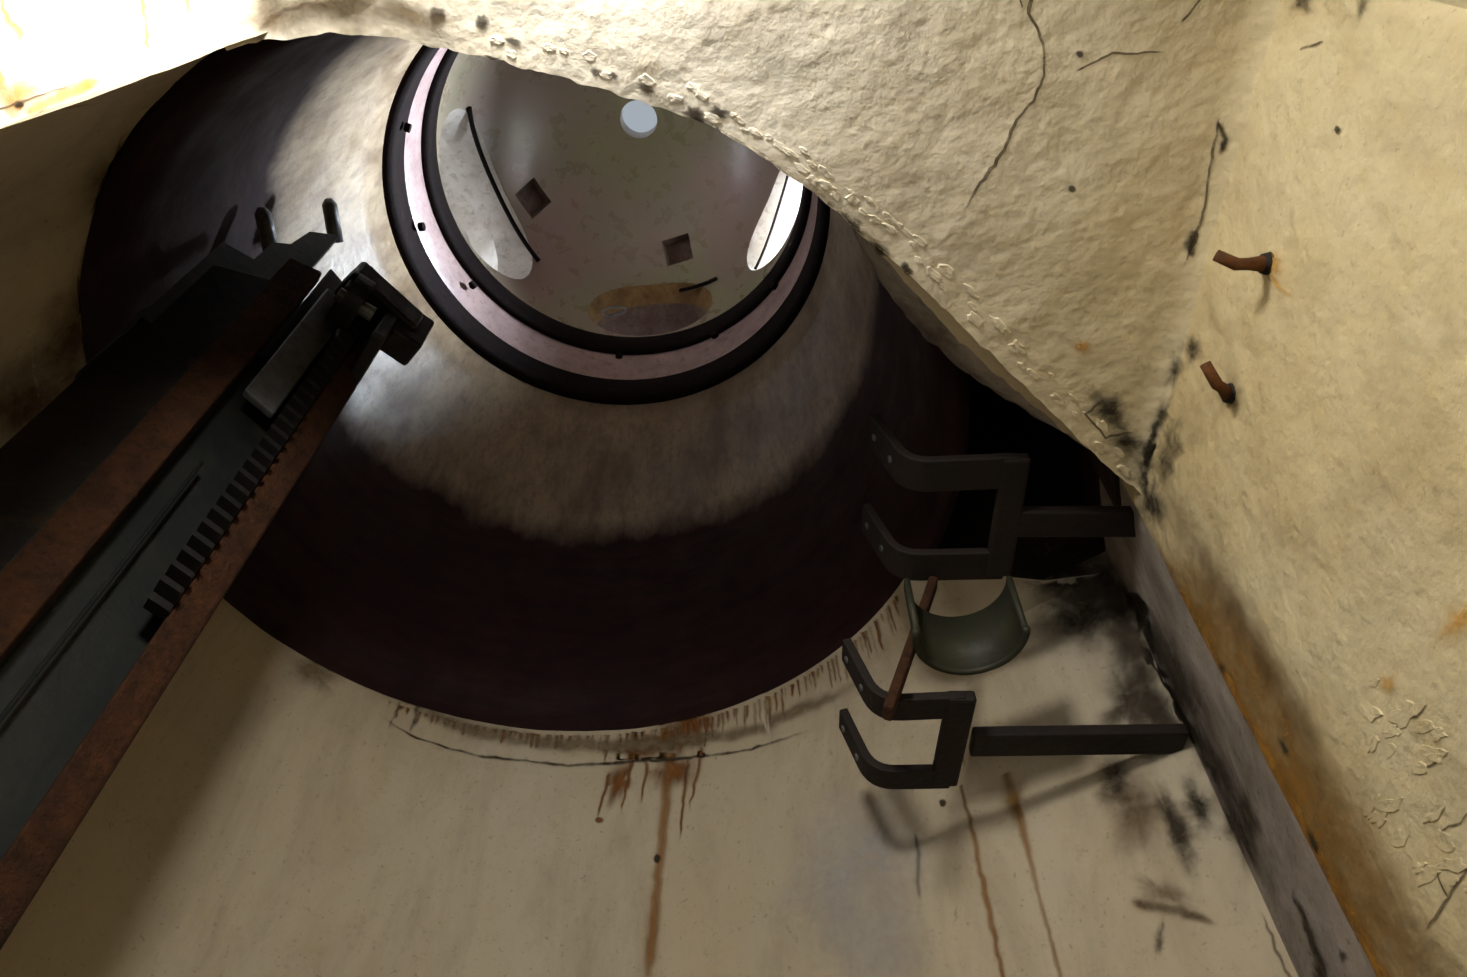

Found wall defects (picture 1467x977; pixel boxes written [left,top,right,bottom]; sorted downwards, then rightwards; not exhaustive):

crack [1182,0,1201,22]
crack [0,88,63,110]
corrosion [0,73,95,113]
crack [968,0,1158,205]
crack [1185,122,1228,259]
water stain [1171,340,1197,381]
water stain [1085,398,1179,519]
corrosion [854,596,898,652]
mould [1016,537,1199,724]
corrosion [396,655,841,969]
mould [1106,730,1257,866]
water stain [1170,567,1426,977]